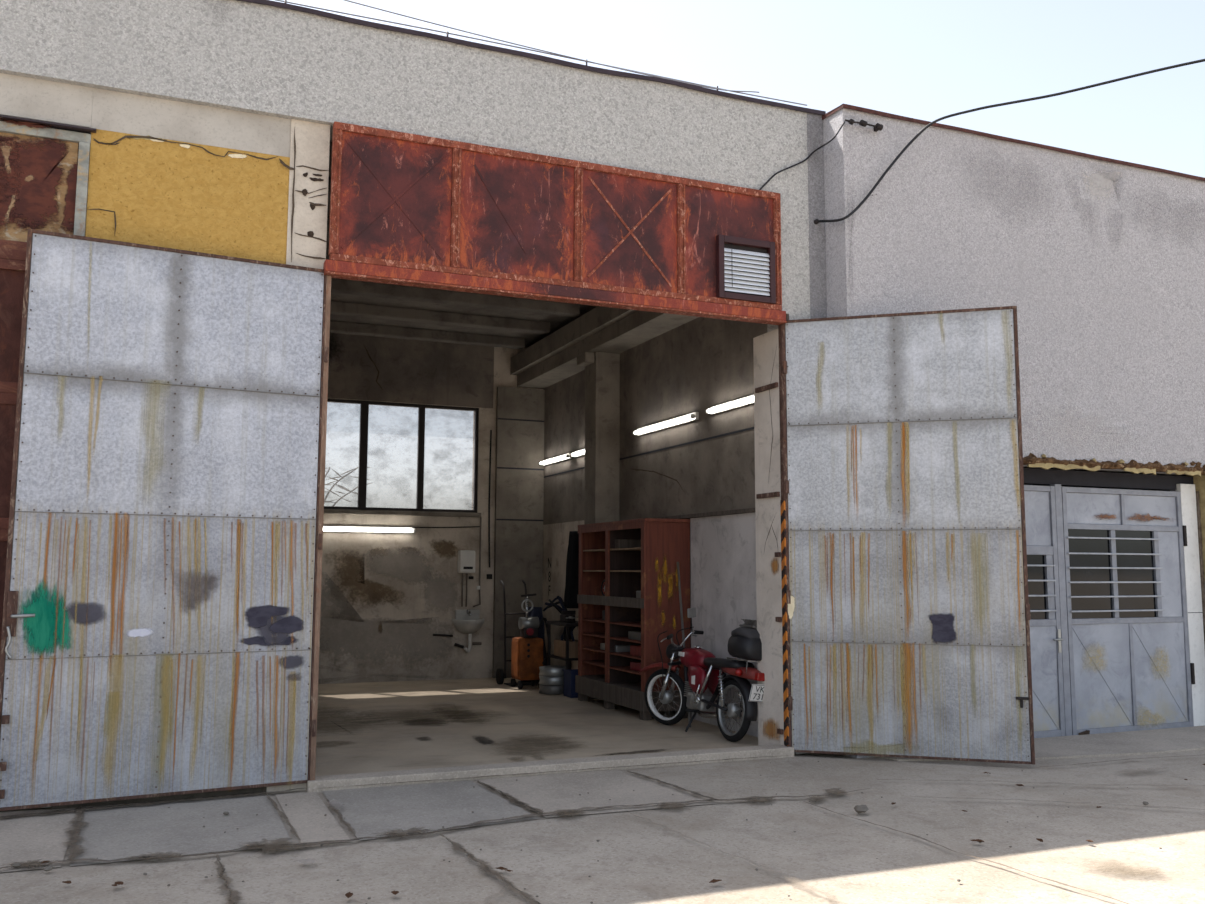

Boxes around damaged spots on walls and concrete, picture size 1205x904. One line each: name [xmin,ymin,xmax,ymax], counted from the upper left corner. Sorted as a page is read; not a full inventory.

peeling [1,146,11,170]
crack [93,128,329,262]
rust [901,422,909,512]
rust [32,512,95,779]
rust [109,513,129,771]
rust [231,519,246,635]
rust [272,521,309,617]
rust [825,531,921,742]
spalling [1023,453,1205,646]
rust [230,652,240,780]
rust [256,655,295,775]
crack [0,755,1128,904]